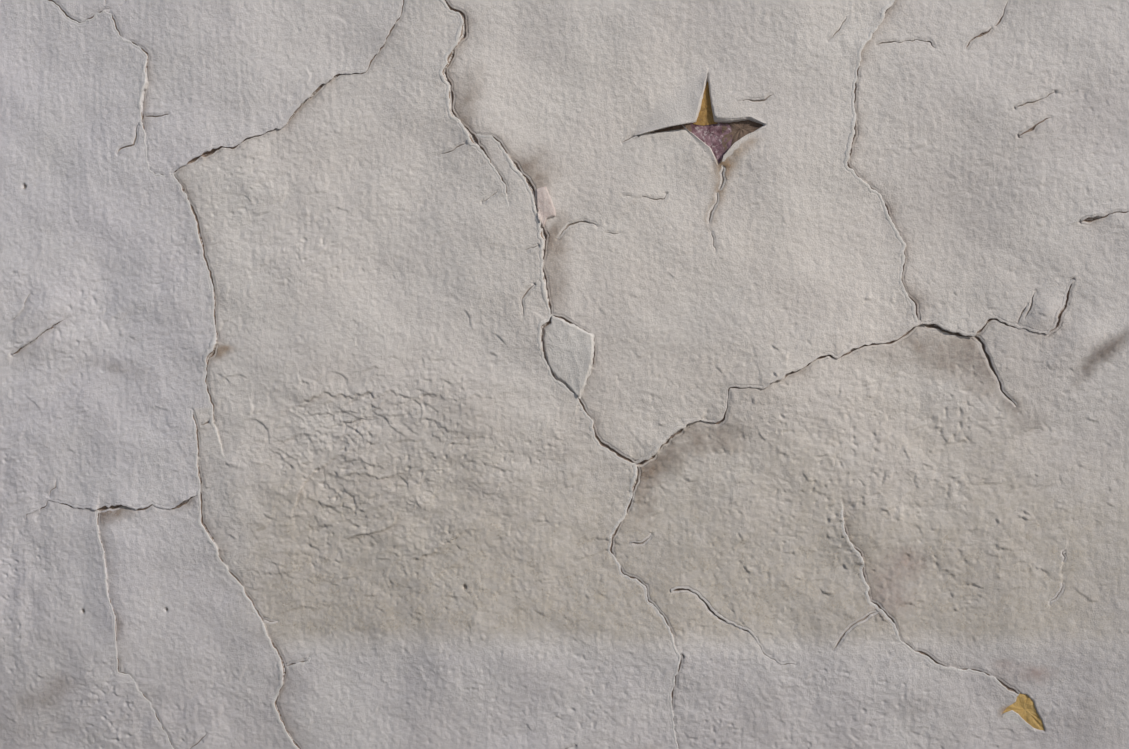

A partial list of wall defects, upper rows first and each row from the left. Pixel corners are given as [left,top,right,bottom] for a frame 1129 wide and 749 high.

flaking render [690,122,732,163]
crack [1081,209,1129,225]
crack [11,292,67,356]
crack [23,0,406,749]
crack [438,0,1075,749]
crack [295,393,456,504]
peeling [1001,693,1045,732]